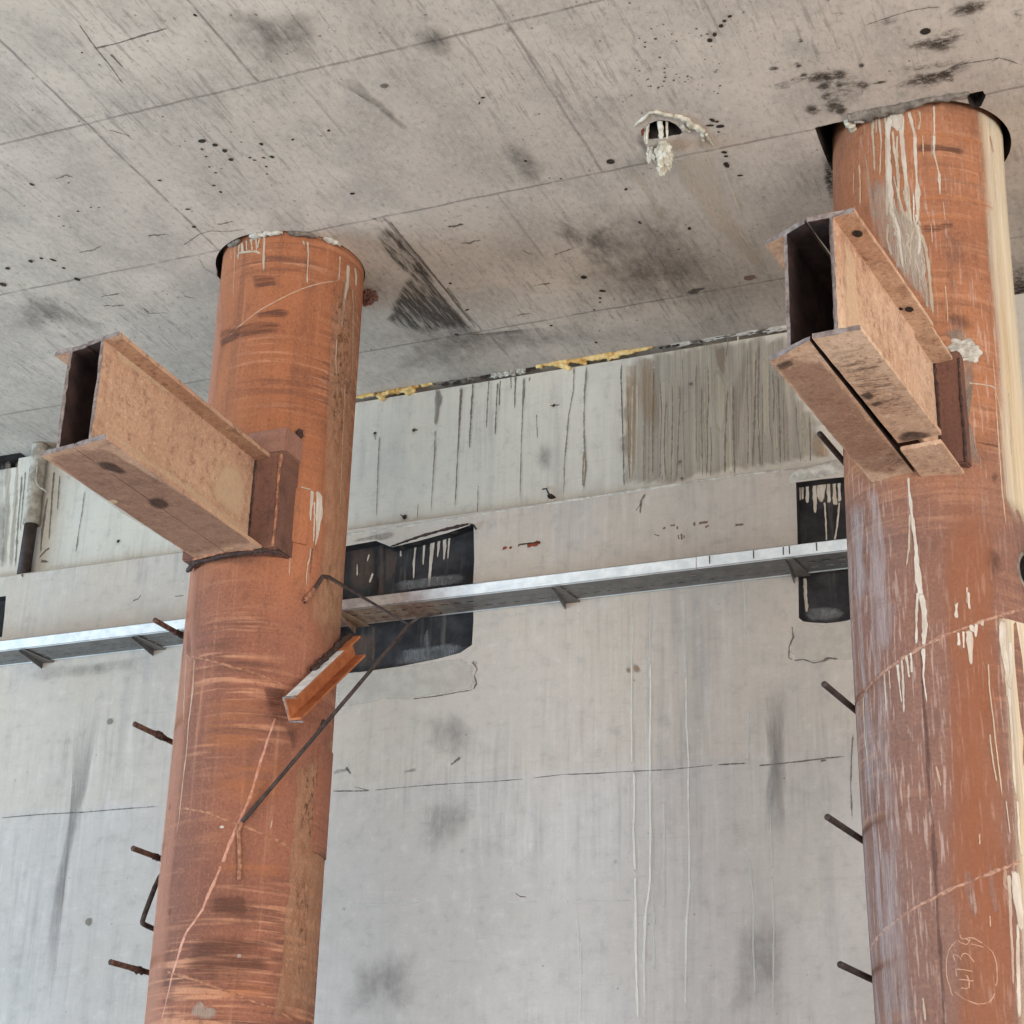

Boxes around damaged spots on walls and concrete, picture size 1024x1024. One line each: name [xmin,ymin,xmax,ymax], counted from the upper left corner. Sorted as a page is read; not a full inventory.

damp [917,28,955,50]
mould [784,63,885,114]
damp [907,66,958,84]
corrosion [919,145,961,153]
damp [431,391,441,506]
damp [455,384,474,502]
damp [486,377,530,490]
damp [550,369,587,485]
damp [620,336,827,481]
crack [788,627,837,664]
corrosion [194,940,263,970]